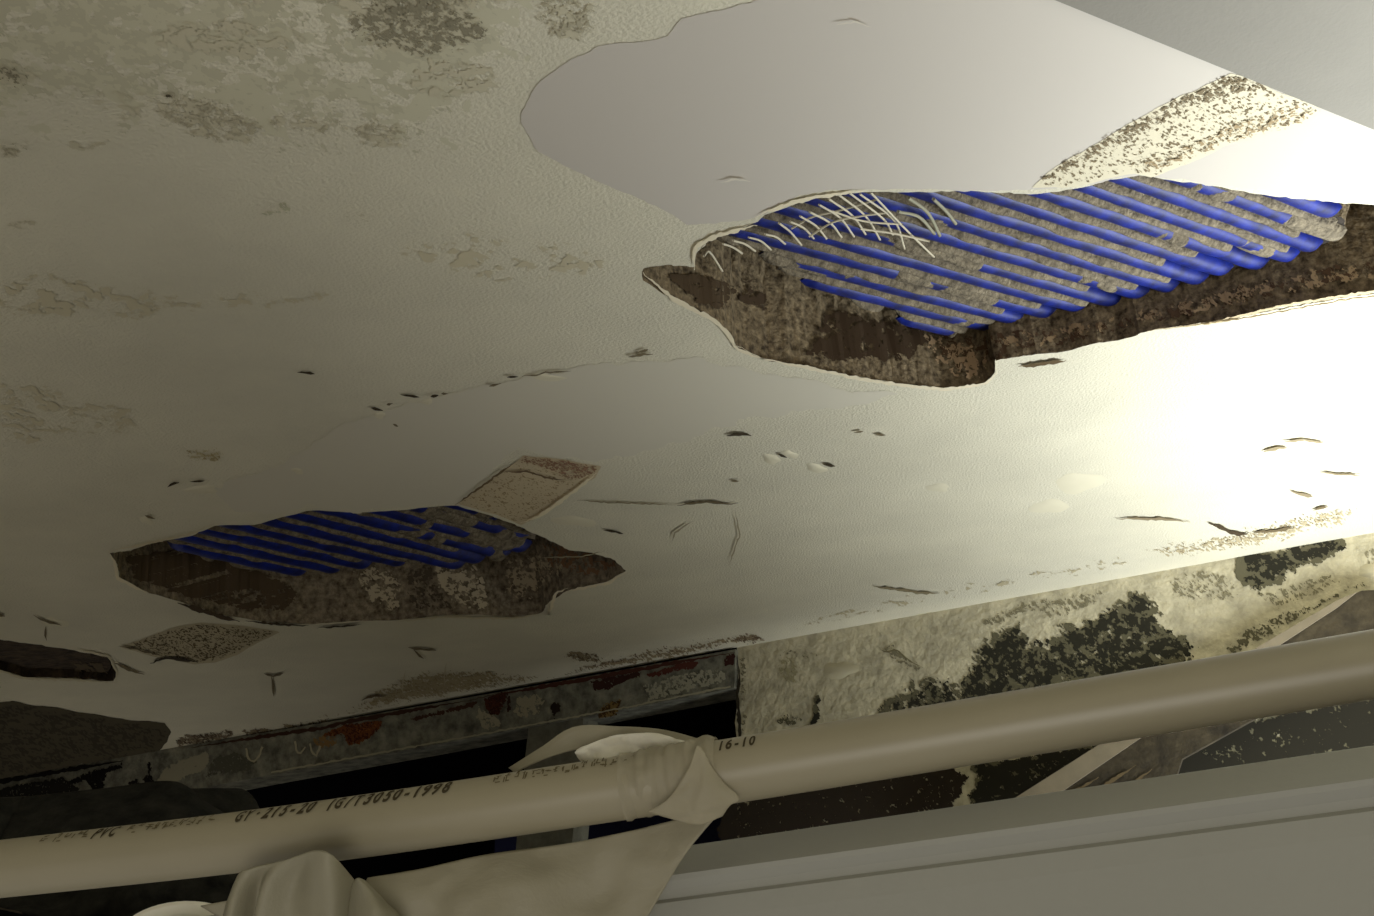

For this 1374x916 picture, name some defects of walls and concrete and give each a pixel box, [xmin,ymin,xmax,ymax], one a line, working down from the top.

water stain [0,0,596,160]
spalling [642,77,1374,391]
spalling [109,456,626,663]
water stain [944,568,1081,598]
water stain [1154,508,1365,653]
spalling [0,640,118,683]
rust [411,692,511,721]
rust [590,661,698,718]
water stain [877,591,1199,713]